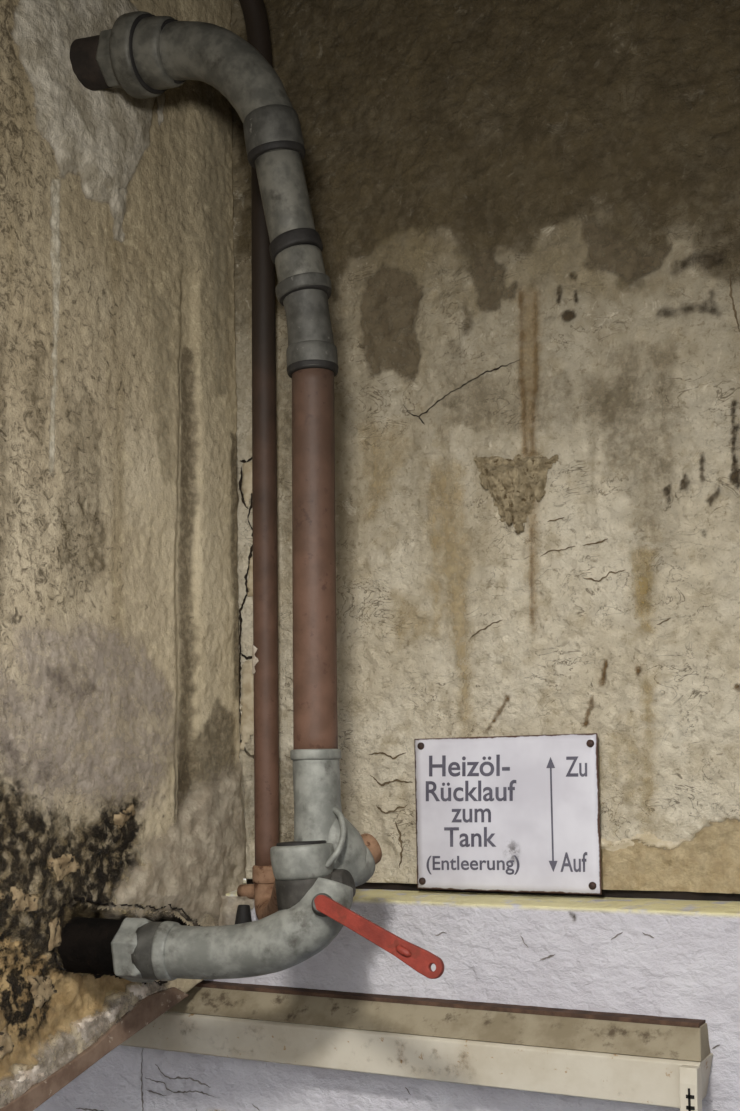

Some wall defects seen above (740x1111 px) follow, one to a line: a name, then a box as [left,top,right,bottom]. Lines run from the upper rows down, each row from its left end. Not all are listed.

water stain [180,349,195,599]
crack [404,360,518,424]
crack [729,273,740,332]
crack [239,457,254,759]
water stain [0,617,234,1041]
spalling [600,818,740,894]